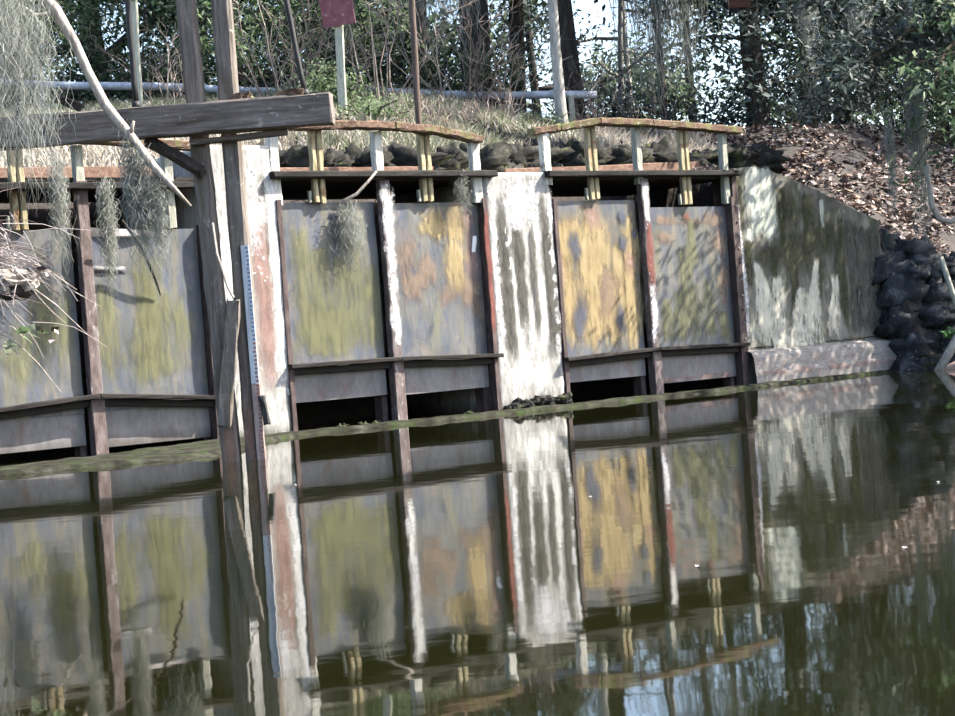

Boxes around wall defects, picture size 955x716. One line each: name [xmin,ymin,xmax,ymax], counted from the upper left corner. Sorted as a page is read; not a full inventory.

damp [745,168,776,242]
damp [496,196,562,386]
corrosion [559,212,725,348]
damp [751,221,882,349]